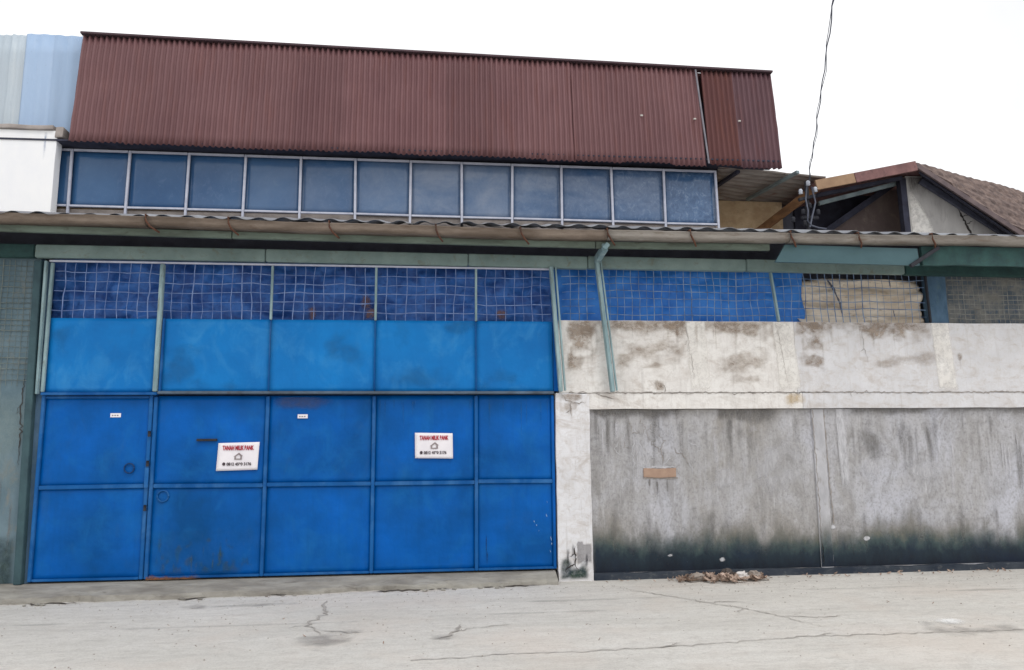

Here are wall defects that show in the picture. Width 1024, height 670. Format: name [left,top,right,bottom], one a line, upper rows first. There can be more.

damp [636,321,688,336]
damp [800,322,834,366]
damp [862,322,915,336]
crack [15,384,24,467]
damp [594,410,701,483]
damp [719,409,772,421]
damp [836,409,849,485]
damp [594,522,1024,573]